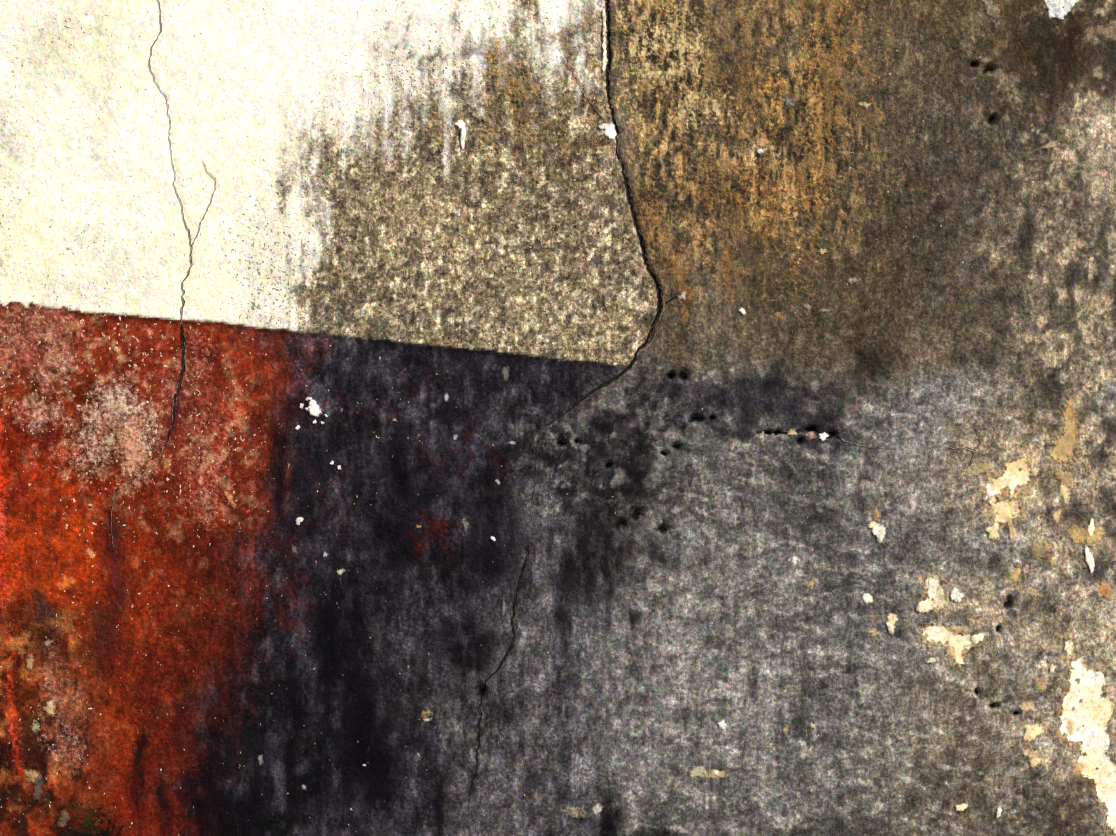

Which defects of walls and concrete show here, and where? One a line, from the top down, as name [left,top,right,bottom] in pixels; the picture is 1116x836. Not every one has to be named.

corrosion [628,0,894,329]
crack [111,0,216,548]
crack [469,0,679,805]
water stain [605,409,655,513]
water stain [561,505,632,625]
water stain [650,543,668,568]
water stain [132,727,171,822]
water stain [182,728,270,836]
water stain [284,569,391,811]
water stain [600,791,623,836]
spalling [1014,702,1042,767]
spalling [1035,636,1116,834]